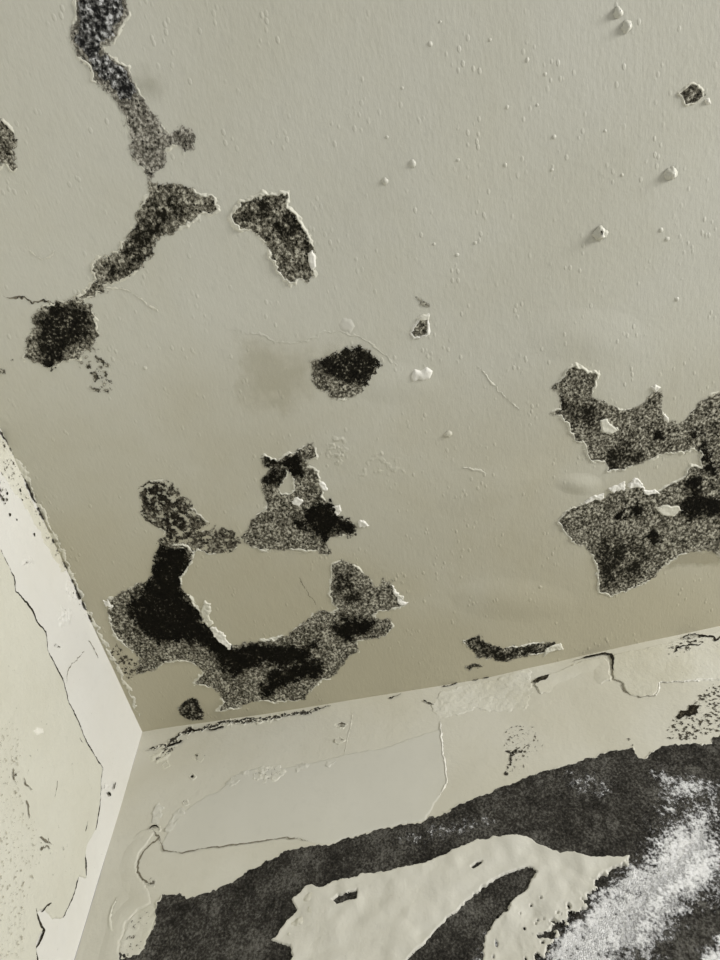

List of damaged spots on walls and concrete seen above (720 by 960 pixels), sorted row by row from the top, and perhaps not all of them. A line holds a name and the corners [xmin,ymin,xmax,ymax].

peeling [0,118,18,172]
peeling [6,0,318,394]
peeling [677,82,711,107]
peeling [103,443,408,712]
peeling [309,344,383,402]
peeling [548,362,720,597]
spalling [107,631,720,960]